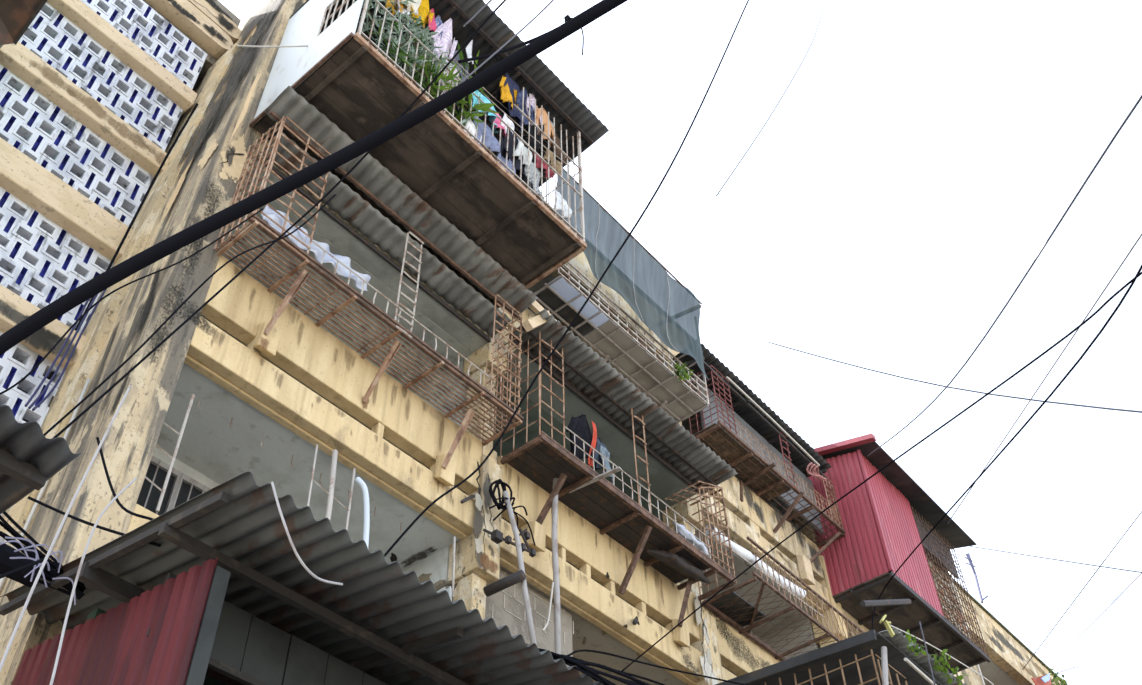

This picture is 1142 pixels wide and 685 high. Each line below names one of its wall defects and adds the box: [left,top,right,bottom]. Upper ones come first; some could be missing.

damp [33,63,163,162]
damp [167,0,304,176]
damp [183,176,223,230]
damp [0,300,29,324]
damp [24,327,77,360]
damp [77,235,213,431]
peeling [418,573,452,592]